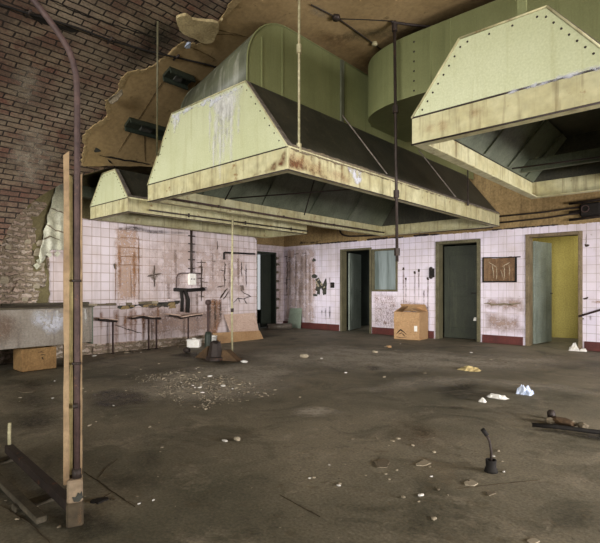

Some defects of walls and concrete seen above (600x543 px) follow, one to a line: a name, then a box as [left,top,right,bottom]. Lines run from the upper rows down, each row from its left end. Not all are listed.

flaking render [81,0,242,162]
spalling [0,183,64,304]
corrosion [115,230,142,300]
damp [279,250,314,323]